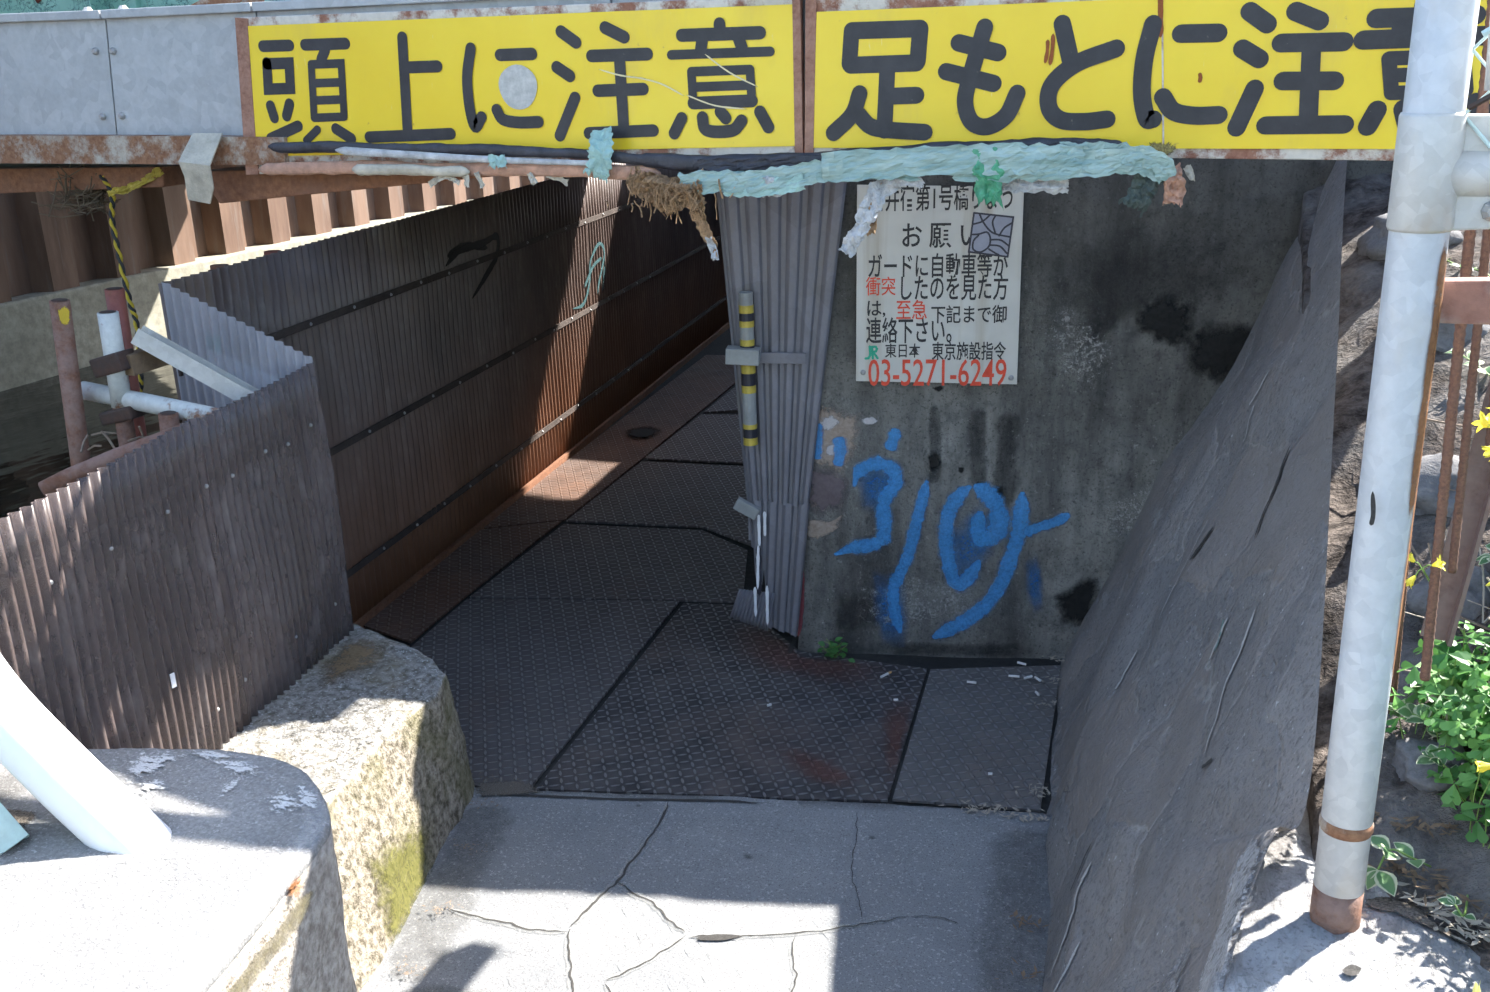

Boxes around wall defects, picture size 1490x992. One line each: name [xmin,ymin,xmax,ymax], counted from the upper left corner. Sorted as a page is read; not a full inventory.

damp [1040,298,1113,382]
damp [1137,296,1252,380]
crack [449,802,957,992]